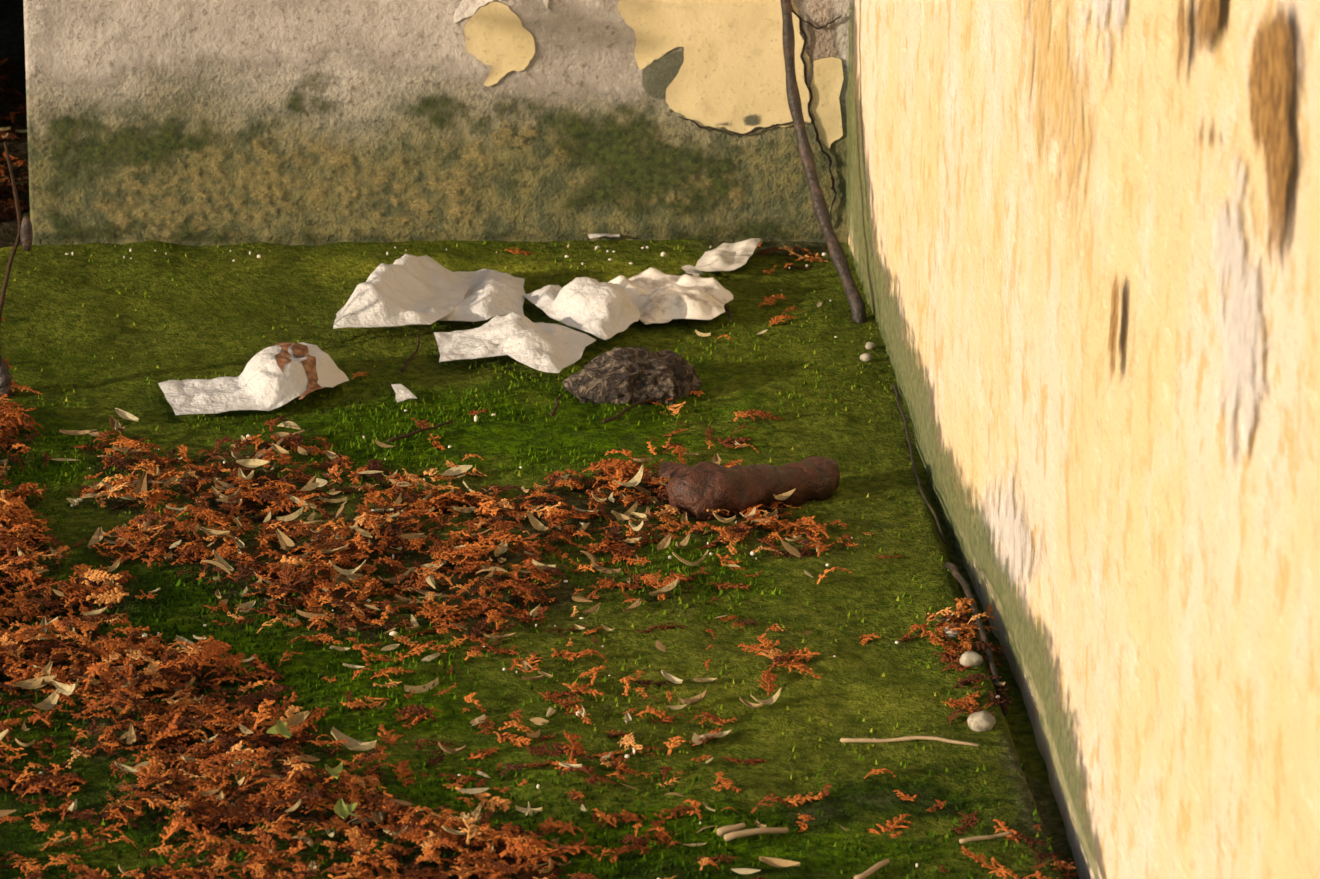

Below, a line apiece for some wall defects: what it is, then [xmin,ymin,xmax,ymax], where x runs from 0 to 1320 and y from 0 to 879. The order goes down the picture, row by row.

peeling [37,0,684,106]
flaking render [802,0,839,63]
spalling [744,115,758,125]